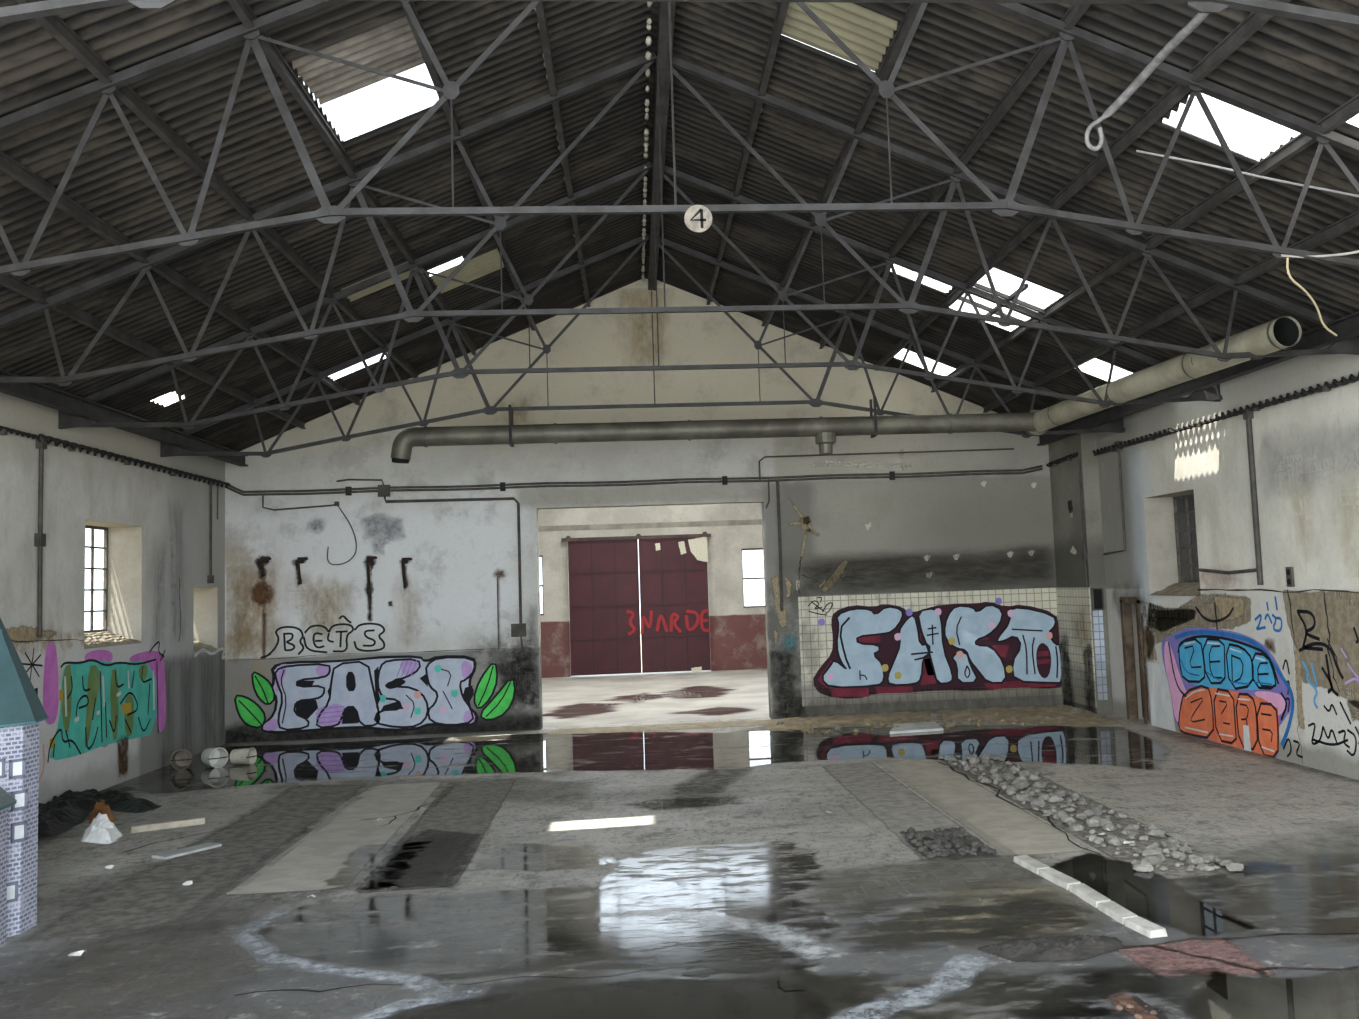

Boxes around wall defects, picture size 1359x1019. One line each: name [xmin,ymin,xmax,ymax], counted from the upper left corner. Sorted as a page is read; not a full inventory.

rust [253,556,272,656]
peeling [1283,590,1359,729]